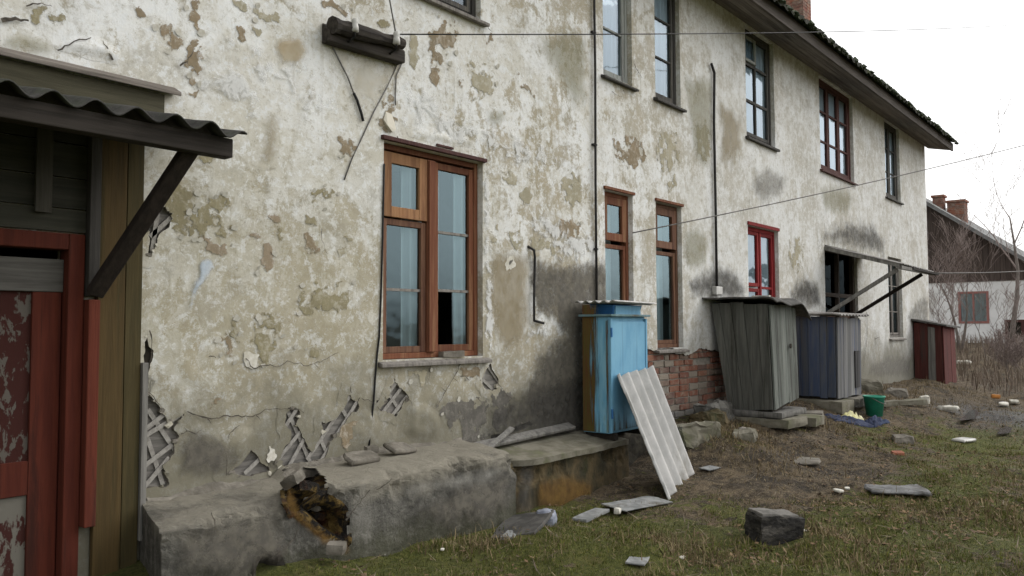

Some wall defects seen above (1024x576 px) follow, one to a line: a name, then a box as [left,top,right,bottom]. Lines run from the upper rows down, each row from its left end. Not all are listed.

peeling [135,0,206,98]
peeling [409,15,500,101]
peeling [612,129,680,193]
peeling [142,182,238,268]
peeling [297,280,356,316]
damp [404,92,606,434]
spalling [141,318,222,500]
crack [181,408,304,476]
crack [246,353,336,369]
spalling [212,368,433,548]
spalling [647,336,727,419]